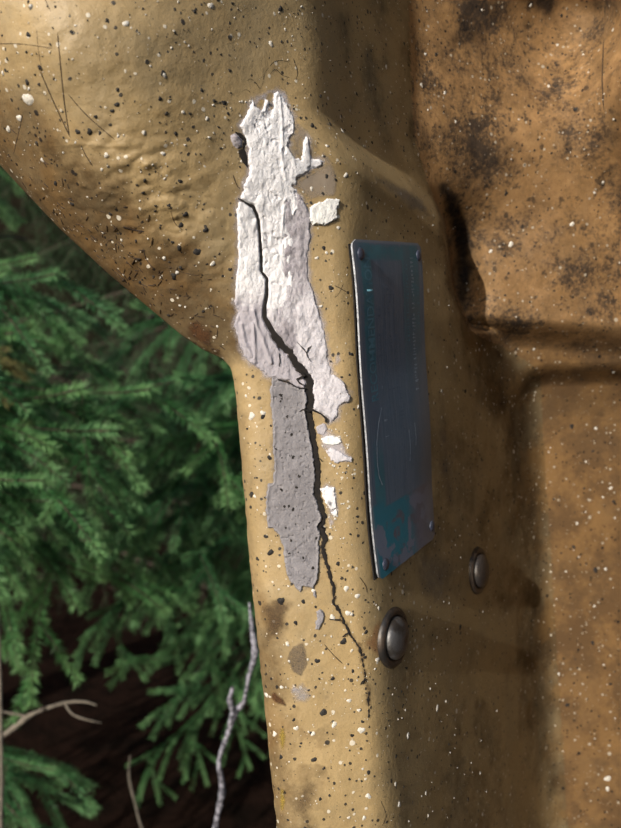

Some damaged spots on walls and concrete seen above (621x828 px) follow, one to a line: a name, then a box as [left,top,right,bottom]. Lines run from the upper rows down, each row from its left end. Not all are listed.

water stain [530,0,553,13]
peeling [234,91,352,464]
water stain [440,183,472,301]
crack [238,198,370,728]
peeling [320,486,338,518]